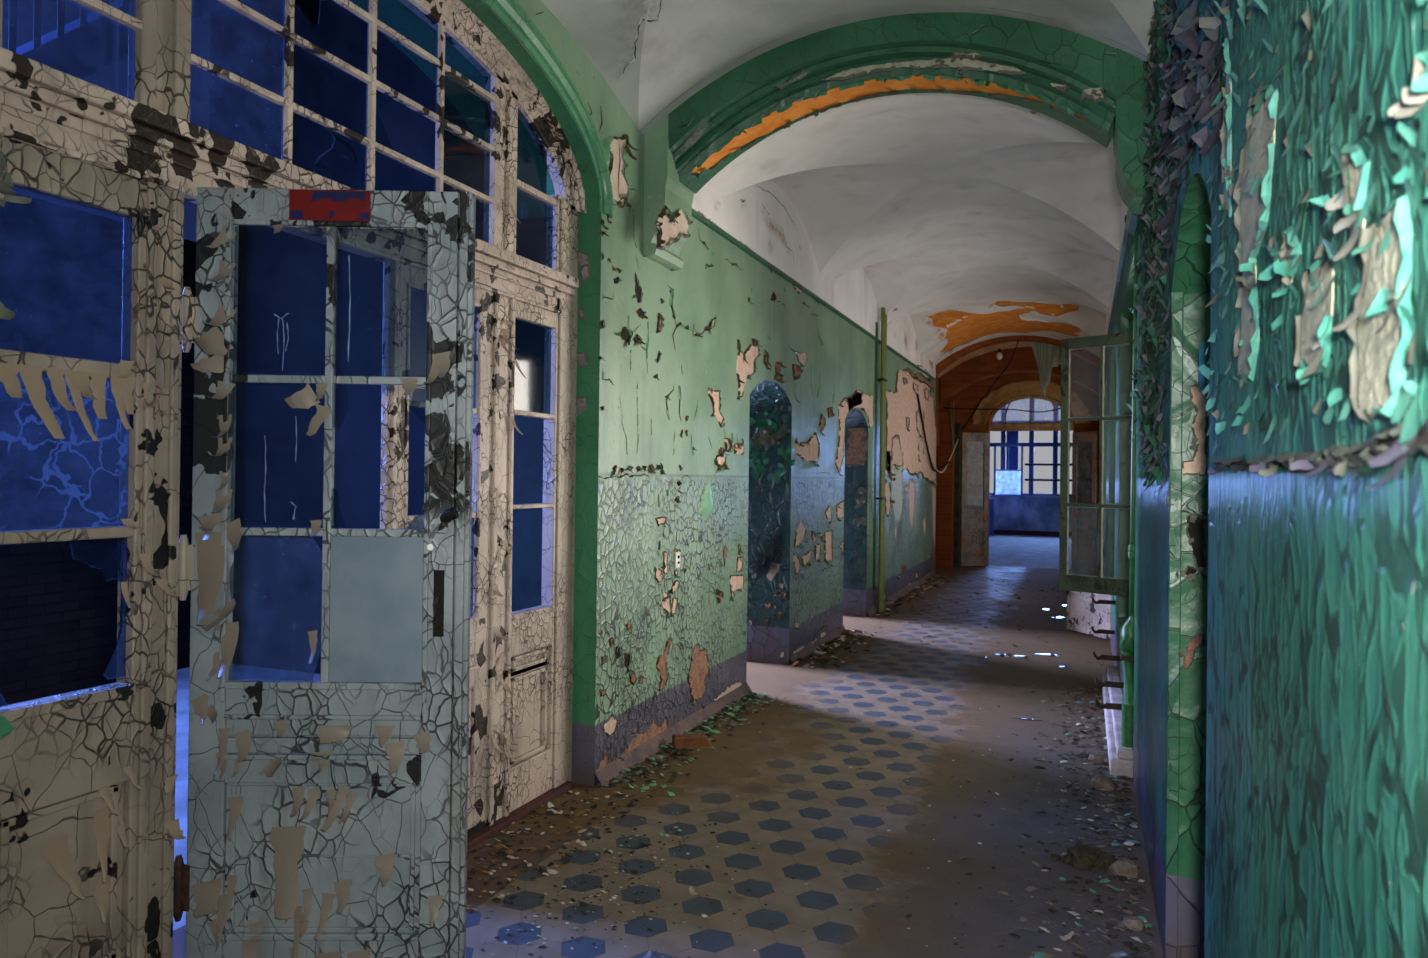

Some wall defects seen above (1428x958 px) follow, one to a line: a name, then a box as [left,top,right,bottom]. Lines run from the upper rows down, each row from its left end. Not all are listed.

peeling [0,153,32,207]
peeling [576,134,665,380]
peeling [655,205,722,251]
peeling [1125,0,1428,506]
peeling [736,338,808,400]
peeling [708,387,874,484]
peeling [612,462,683,503]
peeling [708,487,867,658]
peeling [1176,513,1208,582]
flaking render [598,620,672,691]
flaking render [688,644,744,708]
flaking render [597,714,668,771]